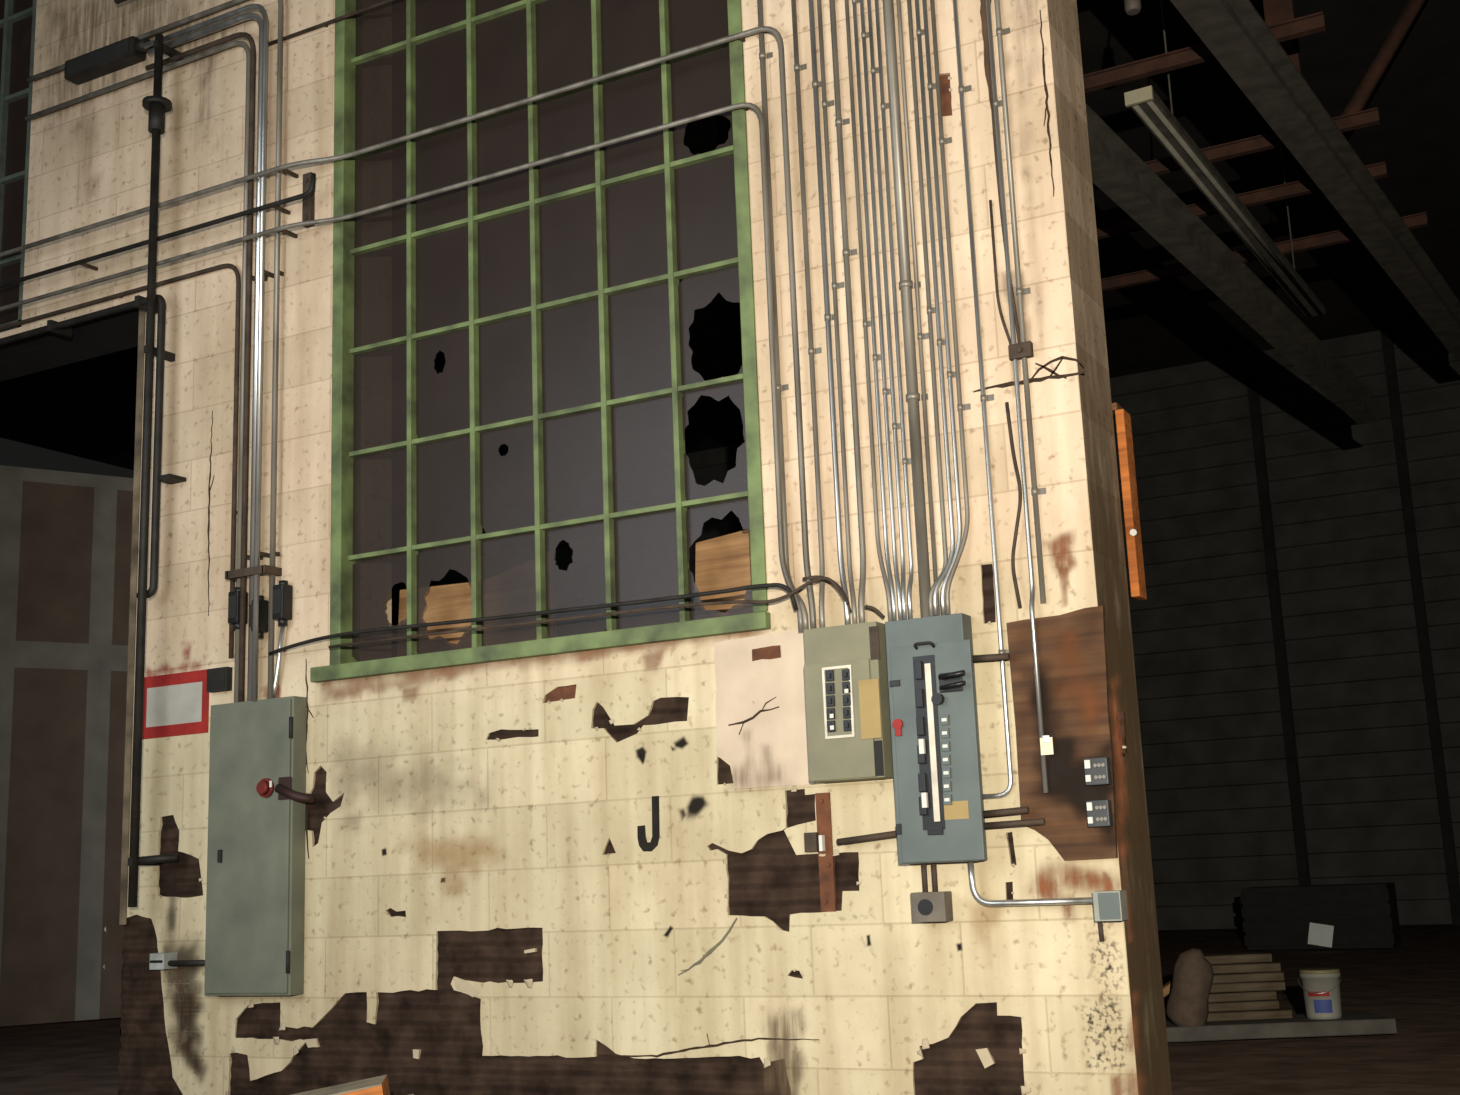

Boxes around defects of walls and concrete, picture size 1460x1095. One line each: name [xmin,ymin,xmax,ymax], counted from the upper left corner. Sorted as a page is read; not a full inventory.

spalling [305,767,344,846]
spalling [544,685,576,704]
spalling [593,697,689,742]
crack [728,697,779,735]
corrosion [1039,428,1172,1095]
spalling [159,815,203,898]
spalling [709,786,861,931]
crack [678,918,738,976]
spalling [103,915,183,1095]
leakage [169,949,200,1073]
spalling [225,928,791,1095]
spalling [914,1002,1031,1095]